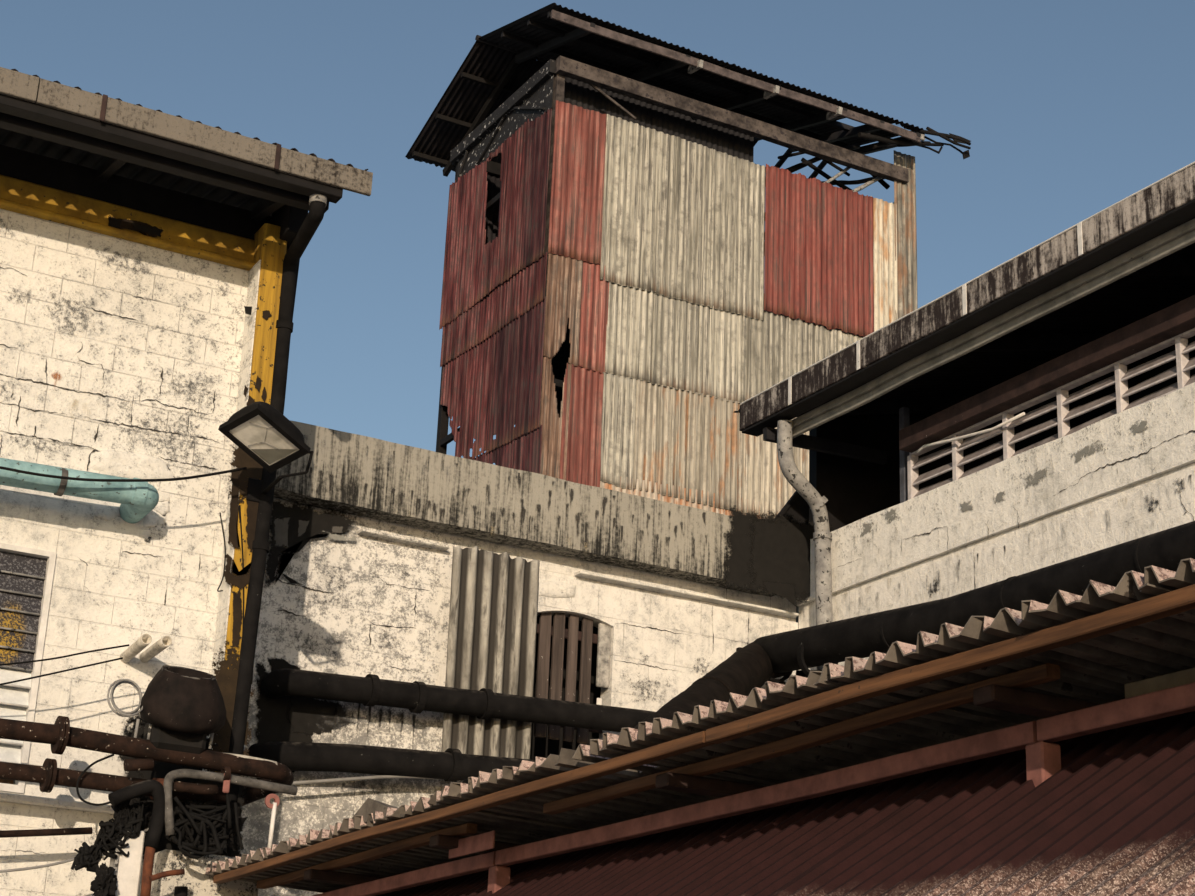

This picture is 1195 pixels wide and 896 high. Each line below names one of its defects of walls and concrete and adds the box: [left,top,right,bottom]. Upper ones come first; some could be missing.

damp [96,248,152,274]
damp [8,288,101,335]
peeling [244,376,267,405]
damp [118,372,210,465]
damp [309,467,368,496]
crack [1053,430,1195,496]
damp [391,489,445,524]
damp [462,473,683,550]
damp [722,505,814,607]